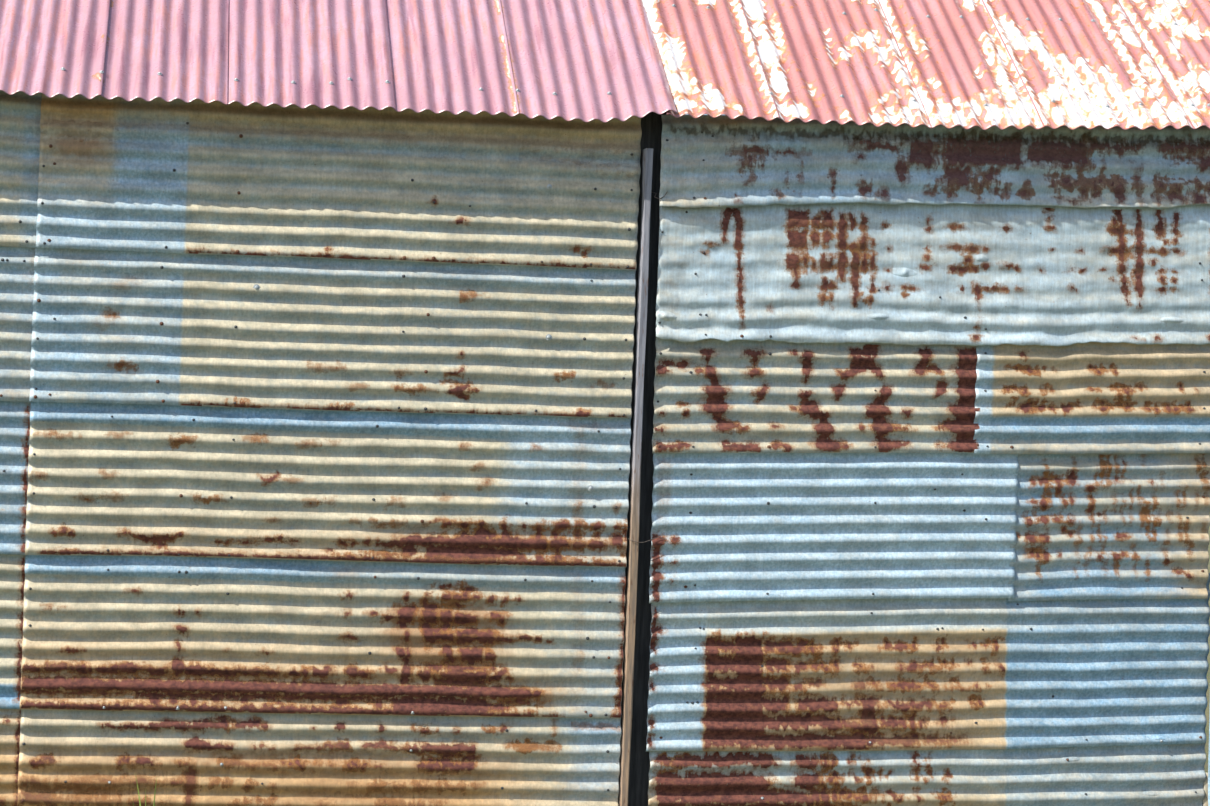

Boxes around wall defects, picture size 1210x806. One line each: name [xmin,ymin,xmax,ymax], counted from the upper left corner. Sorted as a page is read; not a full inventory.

peeling [642,0,746,116]
peeling [695,0,821,121]
peeling [815,0,1210,129]
rust [702,146,803,327]
rust [785,209,916,307]
rust [853,137,1210,309]
rust [654,348,792,452]
rust [789,344,913,453]
rust [912,325,980,453]
rust [1017,470,1103,563]
rust [0,406,627,806]
rust [647,632,1005,806]